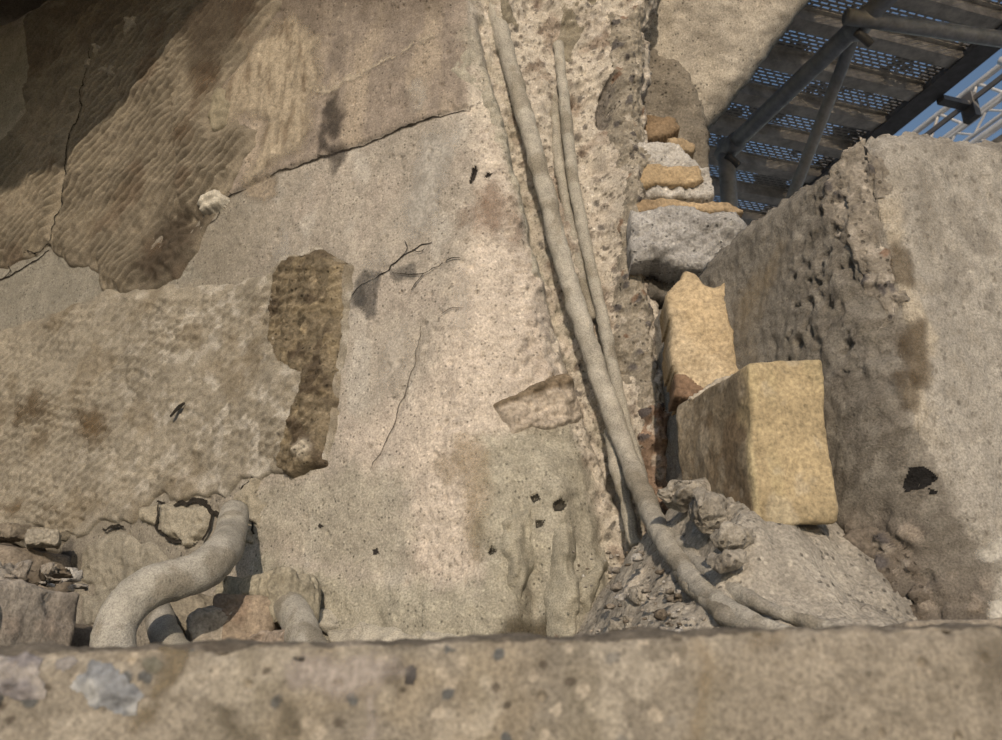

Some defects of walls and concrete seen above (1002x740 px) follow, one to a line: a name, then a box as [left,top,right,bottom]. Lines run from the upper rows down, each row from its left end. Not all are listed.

crack [0,49,90,280]
crack [270,110,465,177]
crack [352,240,460,295]
crack [371,307,464,468]